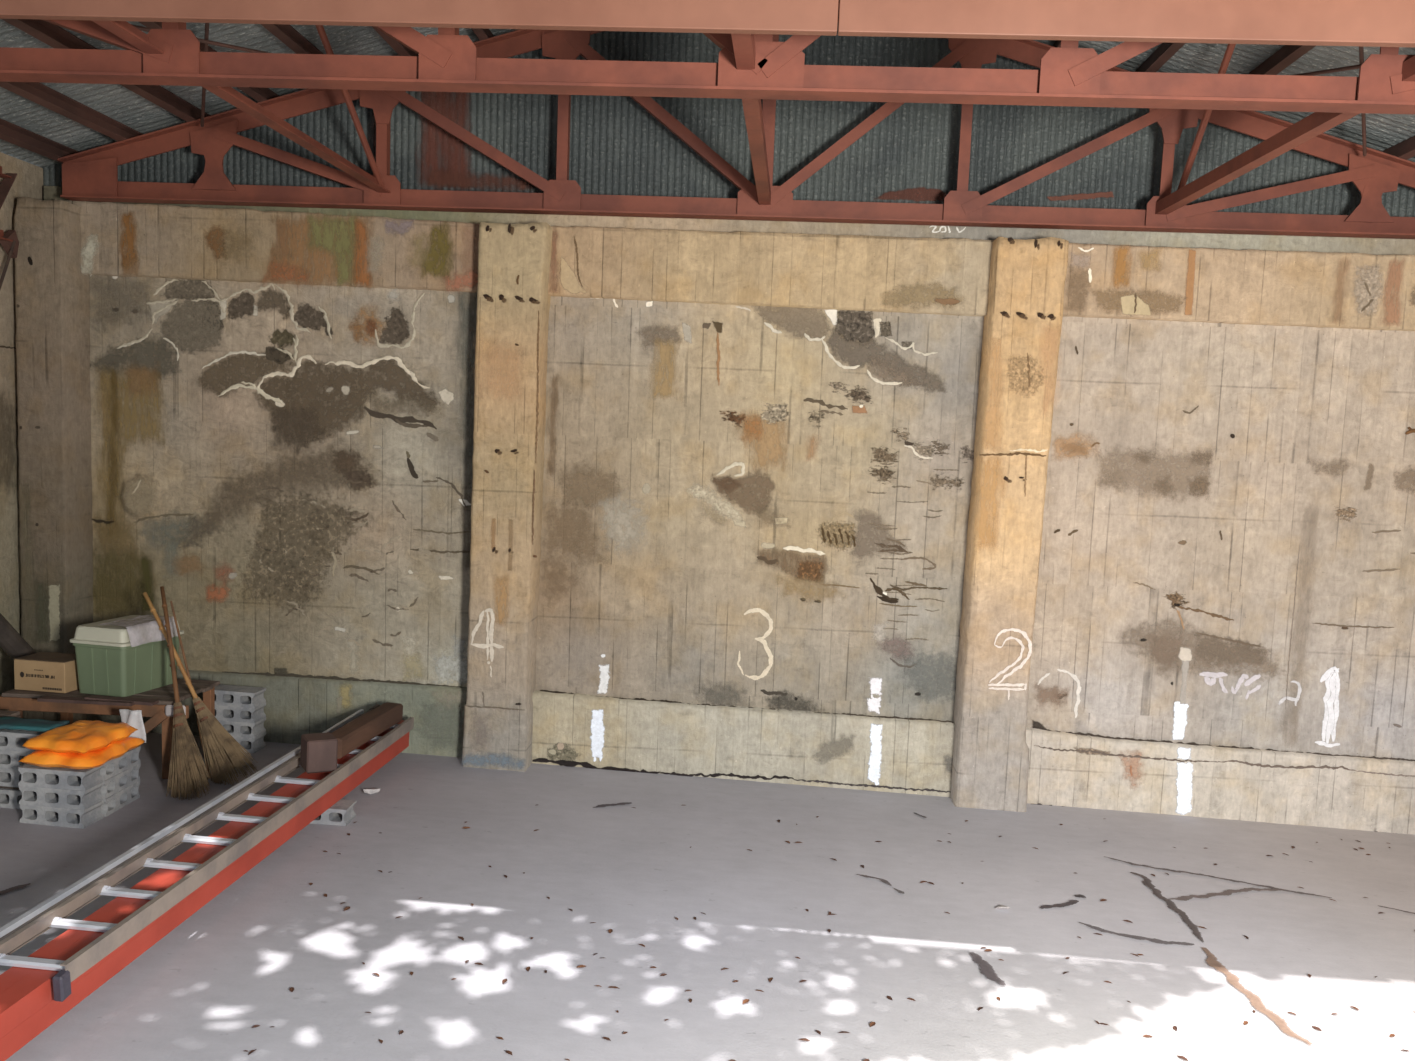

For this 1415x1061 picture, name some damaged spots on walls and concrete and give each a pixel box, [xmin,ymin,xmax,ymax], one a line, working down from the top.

spalling [121,279,333,356]
spalling [375,292,425,349]
spalling [825,309,912,349]
damp [142,293,477,608]
damp [1123,545,1300,709]
crack [1033,720,1415,777]
crack [969,952,1006,986]
crack [1040,856,1332,1045]